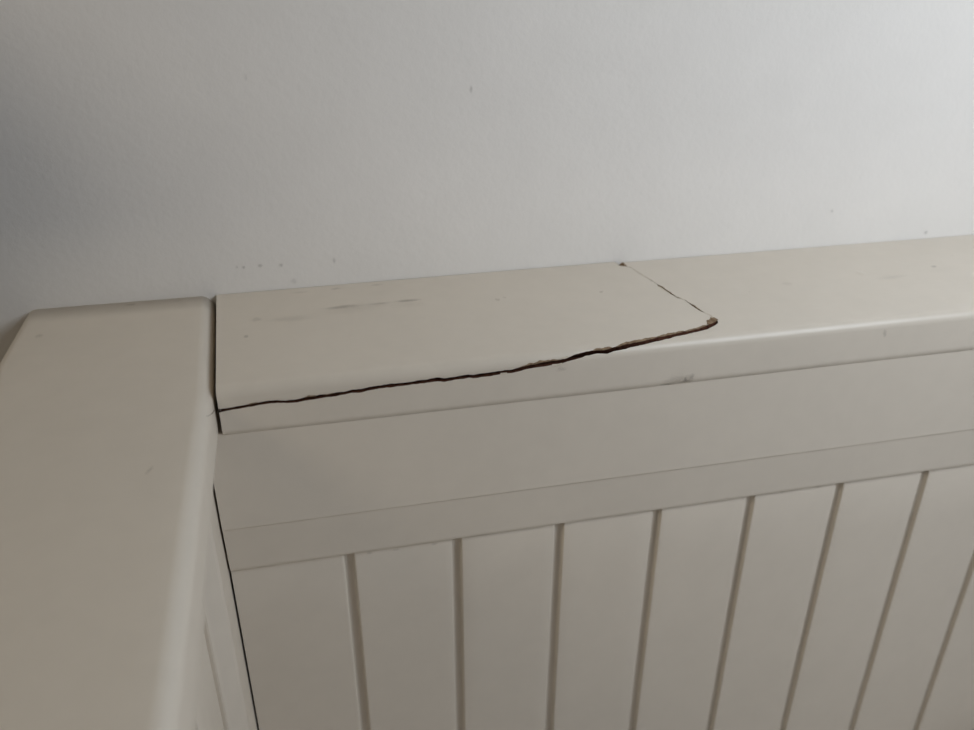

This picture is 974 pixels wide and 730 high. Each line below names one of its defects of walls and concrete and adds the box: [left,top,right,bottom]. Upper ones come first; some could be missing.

crack [209,262,718,416]